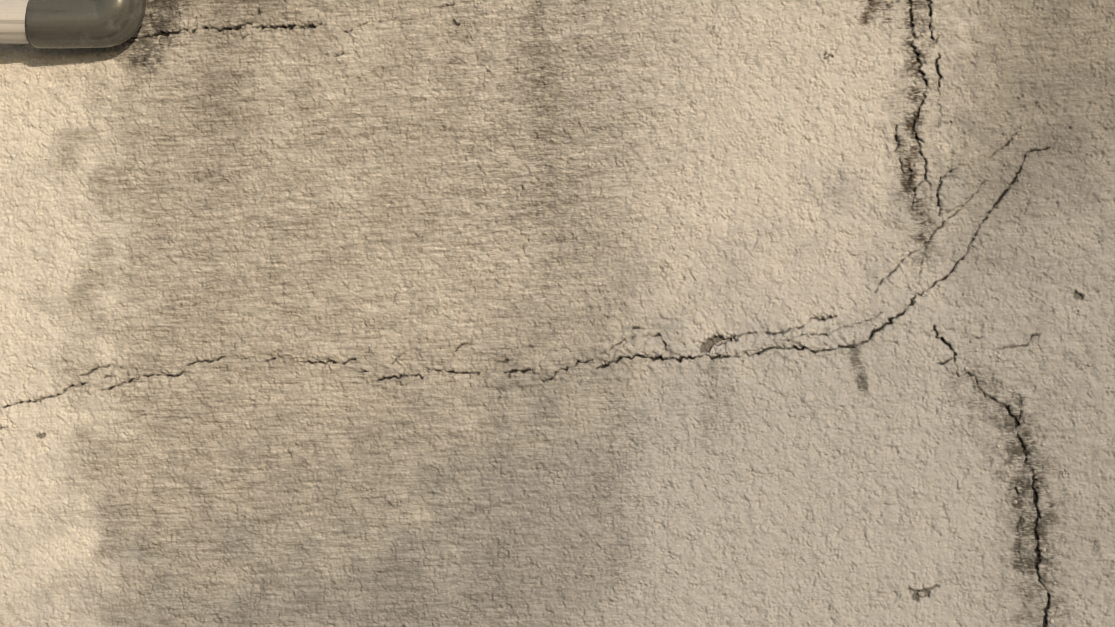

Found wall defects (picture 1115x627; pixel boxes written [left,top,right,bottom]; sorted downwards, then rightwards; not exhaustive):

crack [132,11,381,57]
crack [267,0,1050,382]
crack [0,356,223,429]
crack [933,326,1054,627]